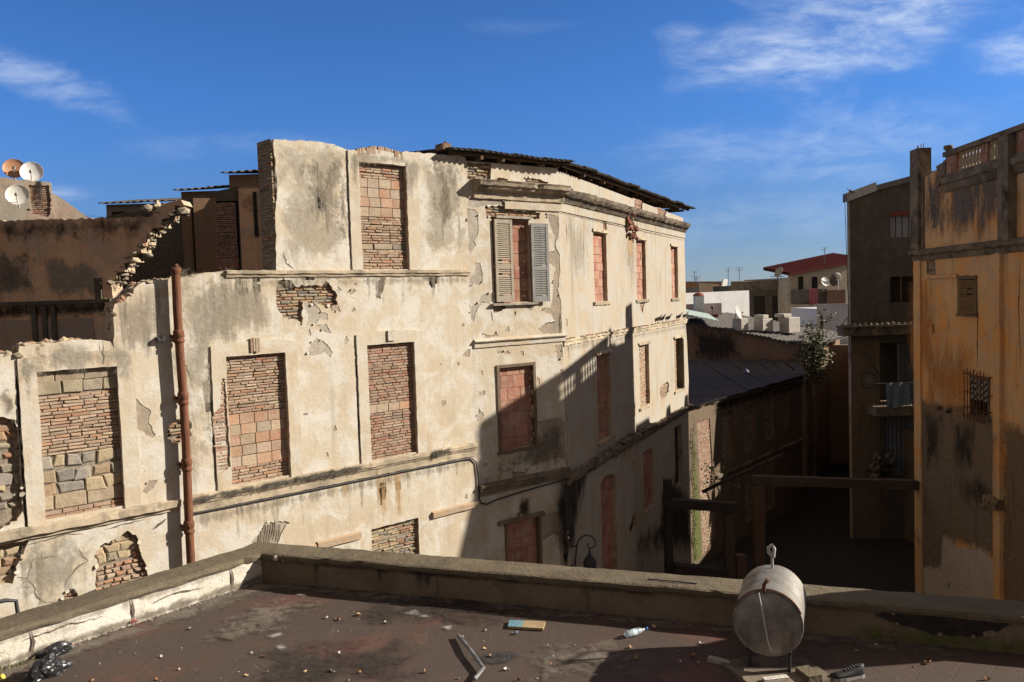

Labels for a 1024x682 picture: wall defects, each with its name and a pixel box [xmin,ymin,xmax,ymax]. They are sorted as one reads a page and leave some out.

spalling [103,200,190,299]
flaking render [276,278,356,357]
peeling [462,196,568,374]
flaking render [0,417,26,527]
peeling [120,399,190,445]
flaking render [212,380,230,474]
corrosion [379,473,401,513]
water stain [922,401,1024,601]
flaking render [94,531,149,590]